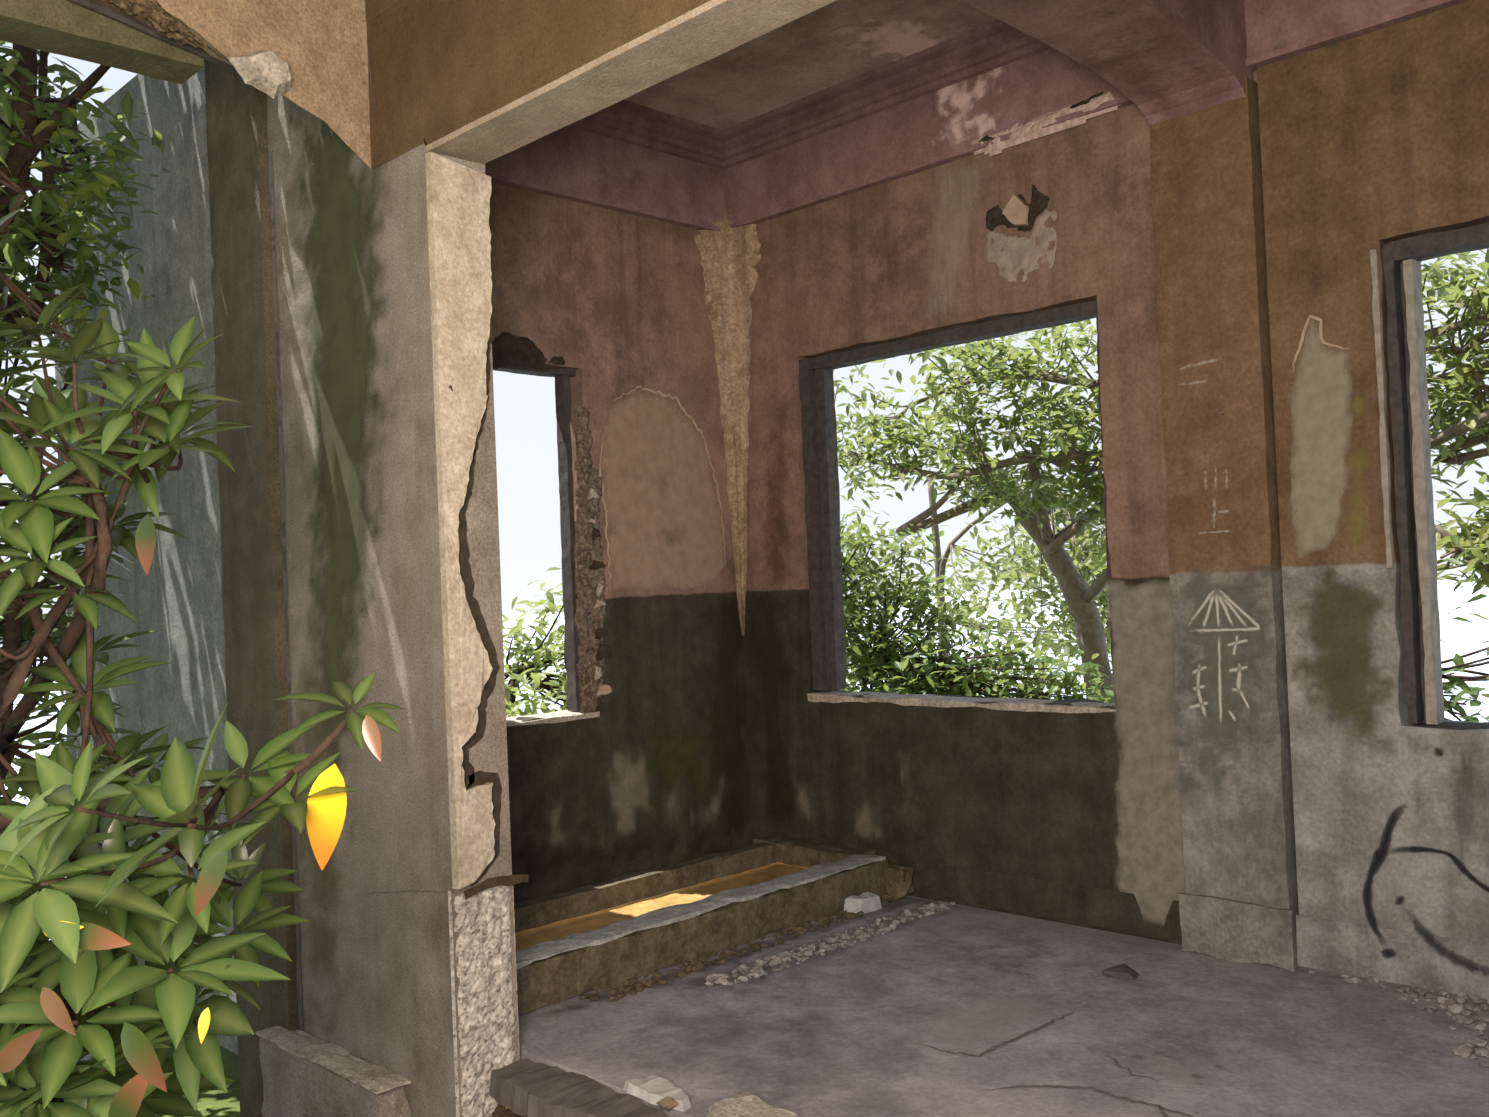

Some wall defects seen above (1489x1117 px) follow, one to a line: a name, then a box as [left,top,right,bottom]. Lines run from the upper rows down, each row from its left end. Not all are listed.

spalling [103,0,292,99]
flaking render [986,183,1058,282]
spalling [970,92,1119,156]
flaking render [574,385,726,713]
peeling [1292,315,1350,553]
peeling [1106,581,1186,924]